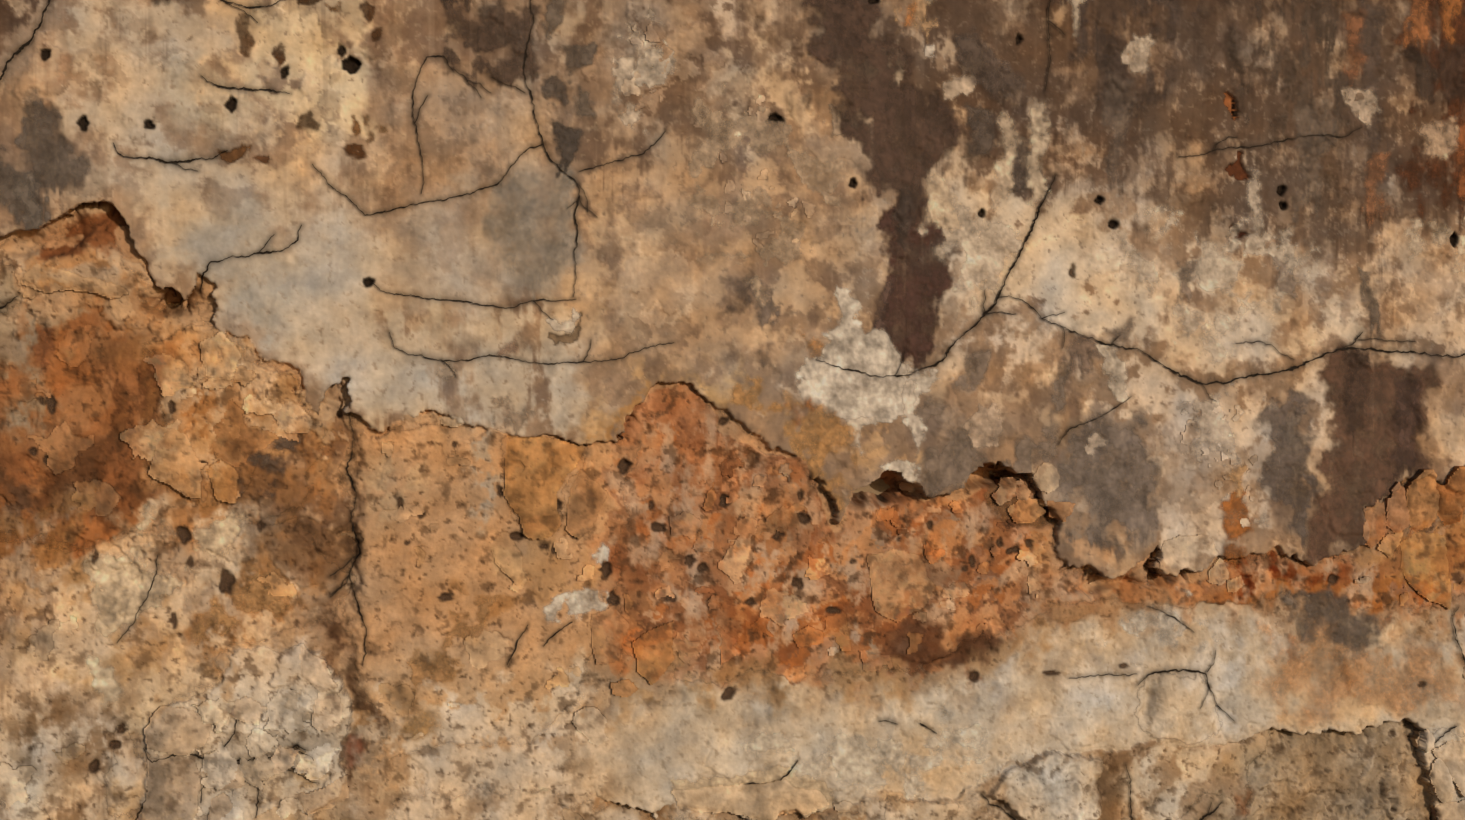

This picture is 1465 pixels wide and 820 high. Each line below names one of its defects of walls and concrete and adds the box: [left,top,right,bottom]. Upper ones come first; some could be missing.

water stain [0,91,90,231]
crack [113,143,228,171]
crack [200,225,302,293]
crack [330,414,367,666]
crack [312,0,665,320]
crack [389,332,674,377]
spalling [0,216,1465,820]
corrosion [732,379,857,510]
water stain [796,0,1160,559]
crack [816,175,1465,402]
water stain [1258,345,1441,565]
corrosion [1362,0,1465,225]